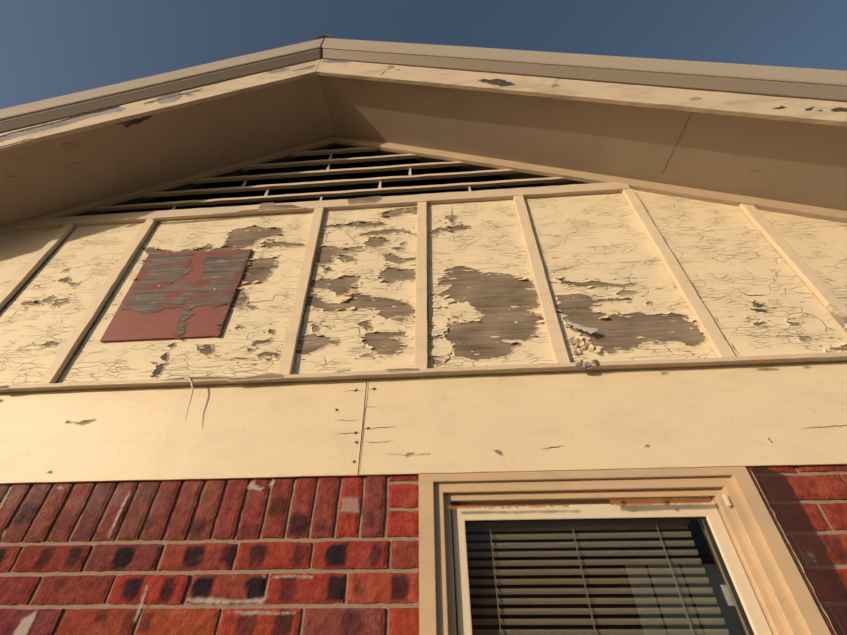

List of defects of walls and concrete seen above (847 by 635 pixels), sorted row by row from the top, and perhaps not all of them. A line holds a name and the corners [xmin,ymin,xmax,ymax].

peeling [0,106,152,148]
peeling [144,89,202,105]
peeling [428,214,471,237]
crack [0,231,73,318]
crack [57,281,121,382]
peeling [120,225,306,365]
peeling [295,196,418,360]
peeling [384,265,545,373]
peeling [548,272,707,356]
spalling [164,373,284,382]
crack [335,380,396,464]